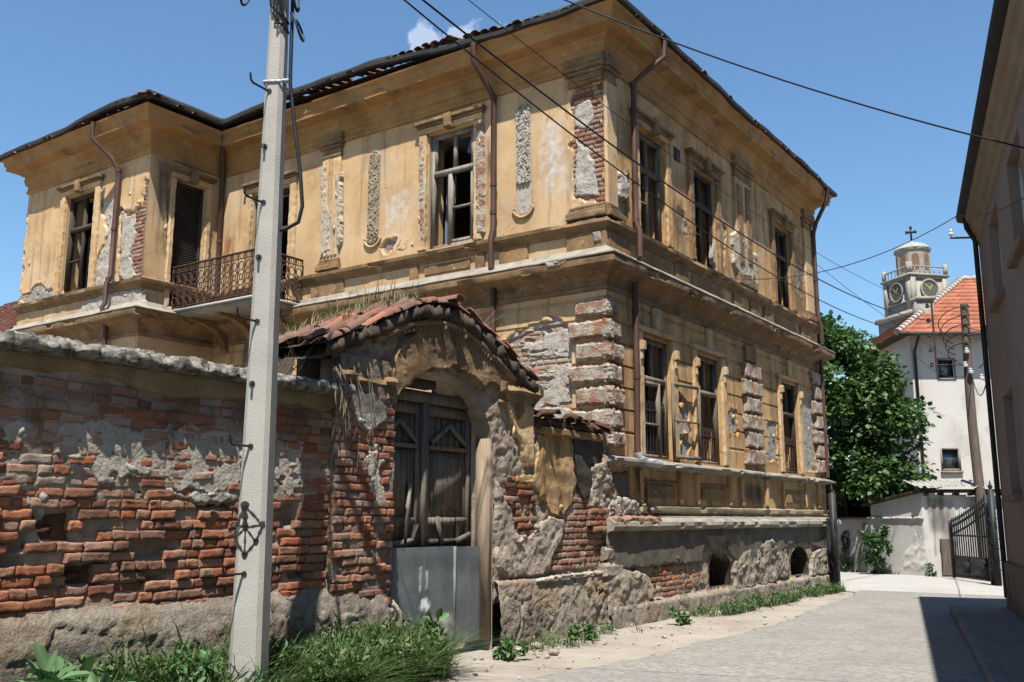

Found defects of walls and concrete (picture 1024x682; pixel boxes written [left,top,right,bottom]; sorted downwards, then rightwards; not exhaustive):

flaking render [570,81,630,202]
flaking render [79,180,149,312]
peeling [350,390,387,433]
peeling [492,317,701,617]
spalling [31,492,67,540]
spalling [197,492,225,507]
spalling [62,564,89,584]